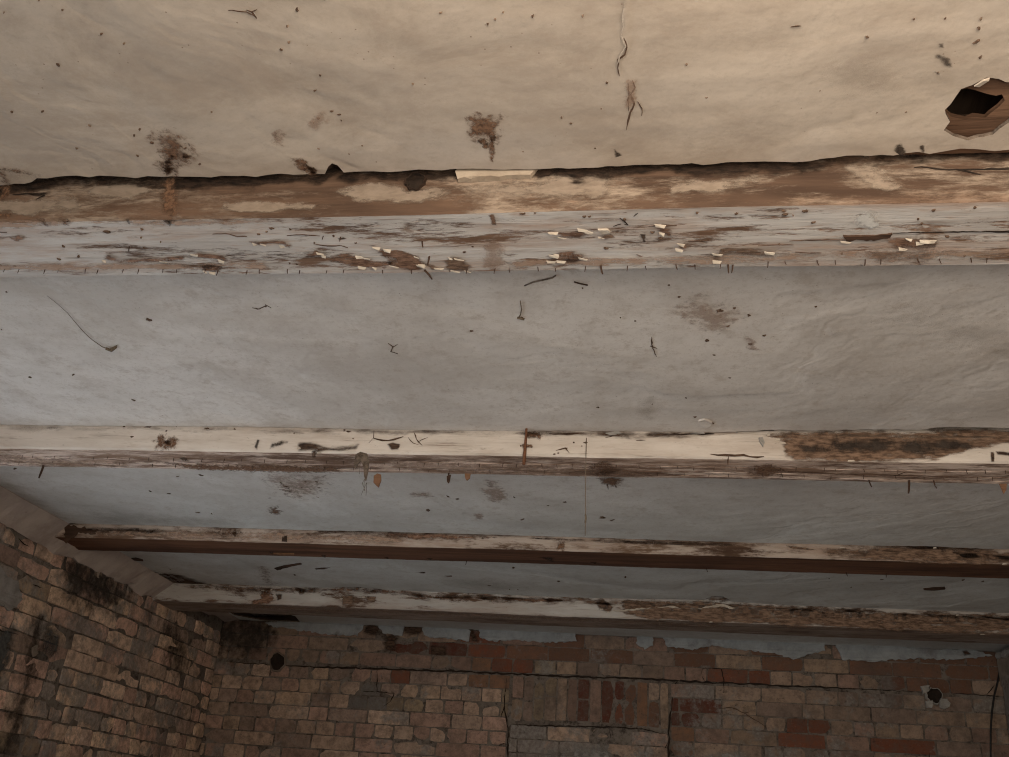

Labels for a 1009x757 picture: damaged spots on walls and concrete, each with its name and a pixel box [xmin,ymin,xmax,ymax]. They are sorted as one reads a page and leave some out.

peeling [548,228,615,240]
peeling [654,224,690,253]
spalling [840,213,937,251]
peeling [102,253,226,275]
peeling [306,245,471,273]
peeling [547,251,588,264]
peeling [712,248,775,264]
peeling [759,429,1009,462]
peeling [296,587,563,605]